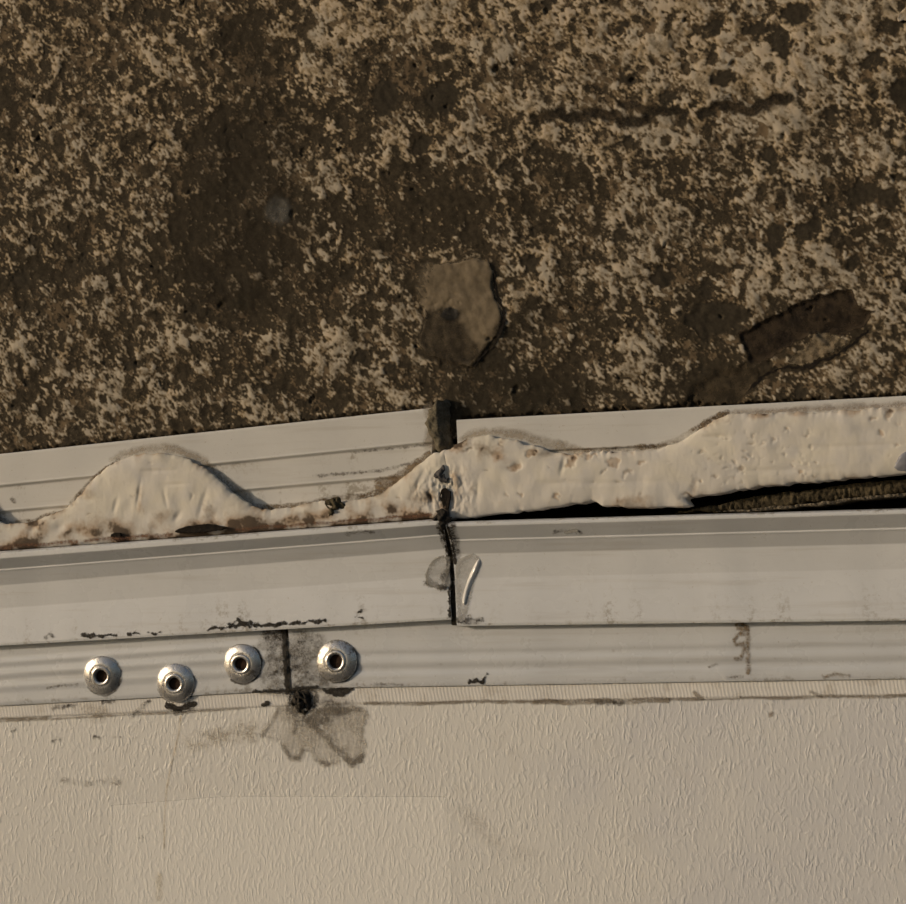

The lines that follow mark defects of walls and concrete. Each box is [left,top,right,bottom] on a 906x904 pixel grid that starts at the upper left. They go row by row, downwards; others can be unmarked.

spalling [416,258,506,370]
spalling [678,289,875,408]
damp [80,631,161,639]
damp [207,617,368,765]